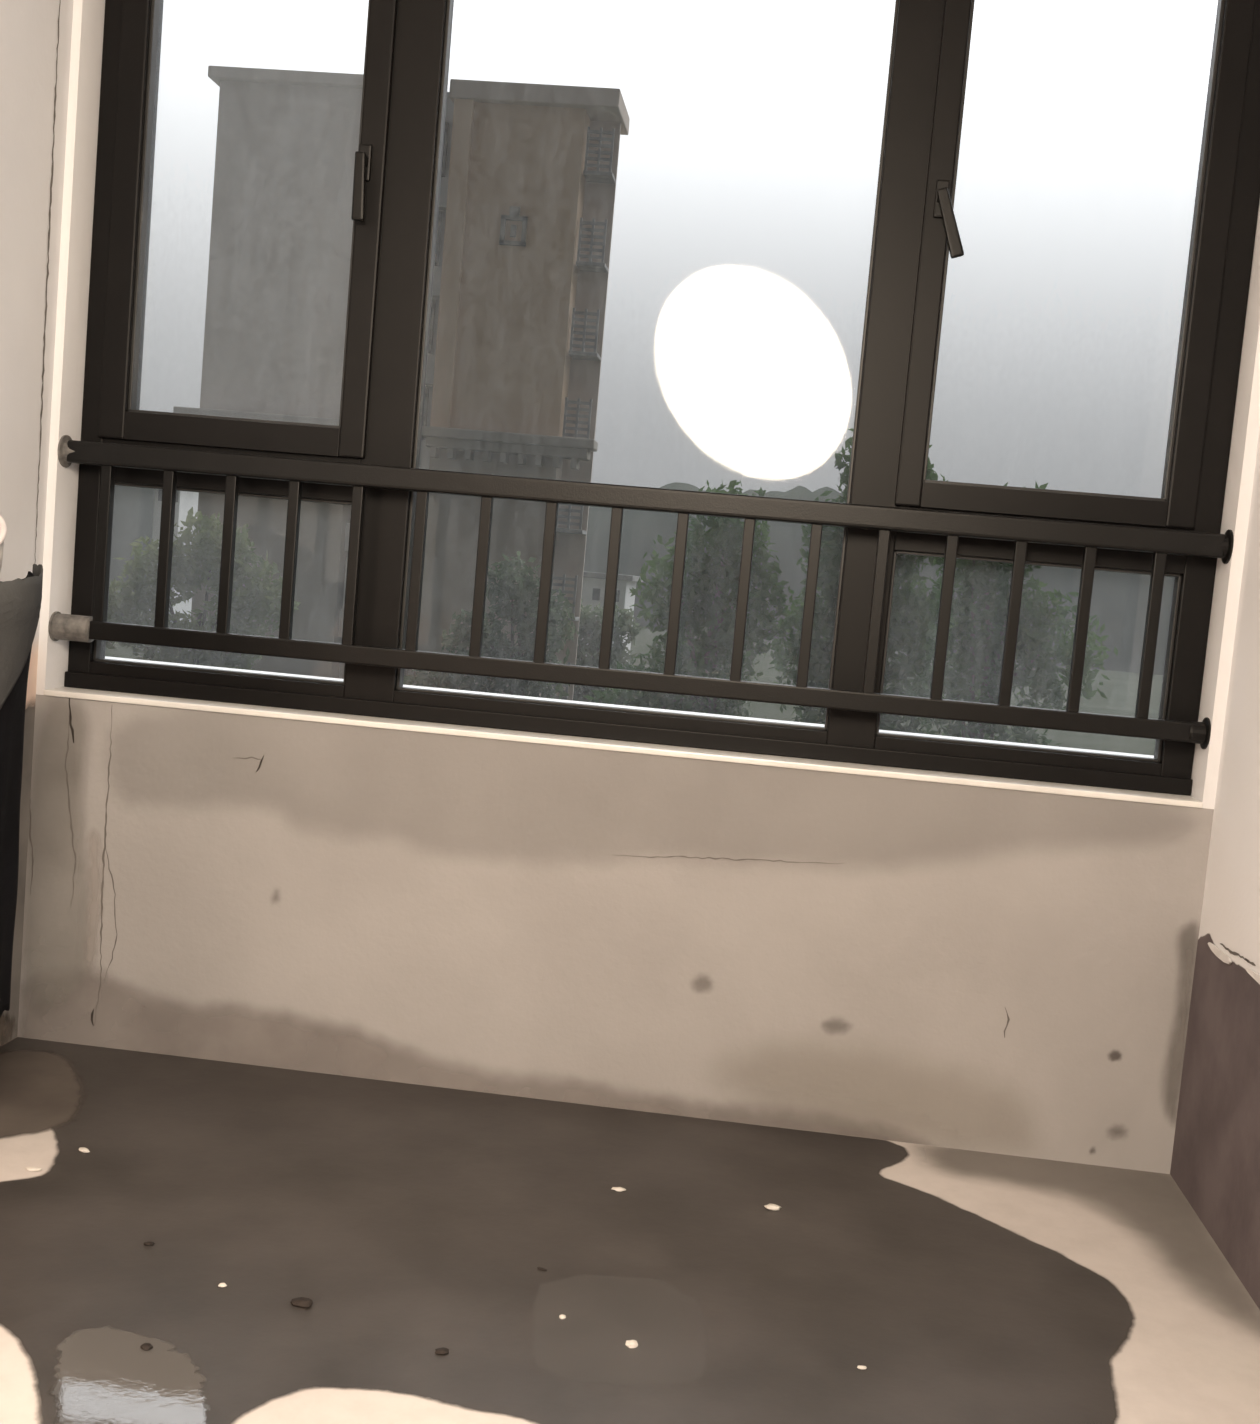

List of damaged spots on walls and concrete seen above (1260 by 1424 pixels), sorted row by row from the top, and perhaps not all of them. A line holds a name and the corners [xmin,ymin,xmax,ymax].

crack [65,698,117,1026]
leakage [0,704,1134,1424]
leakage [1168,928,1195,1115]
peeling [1170,934,1260,1310]